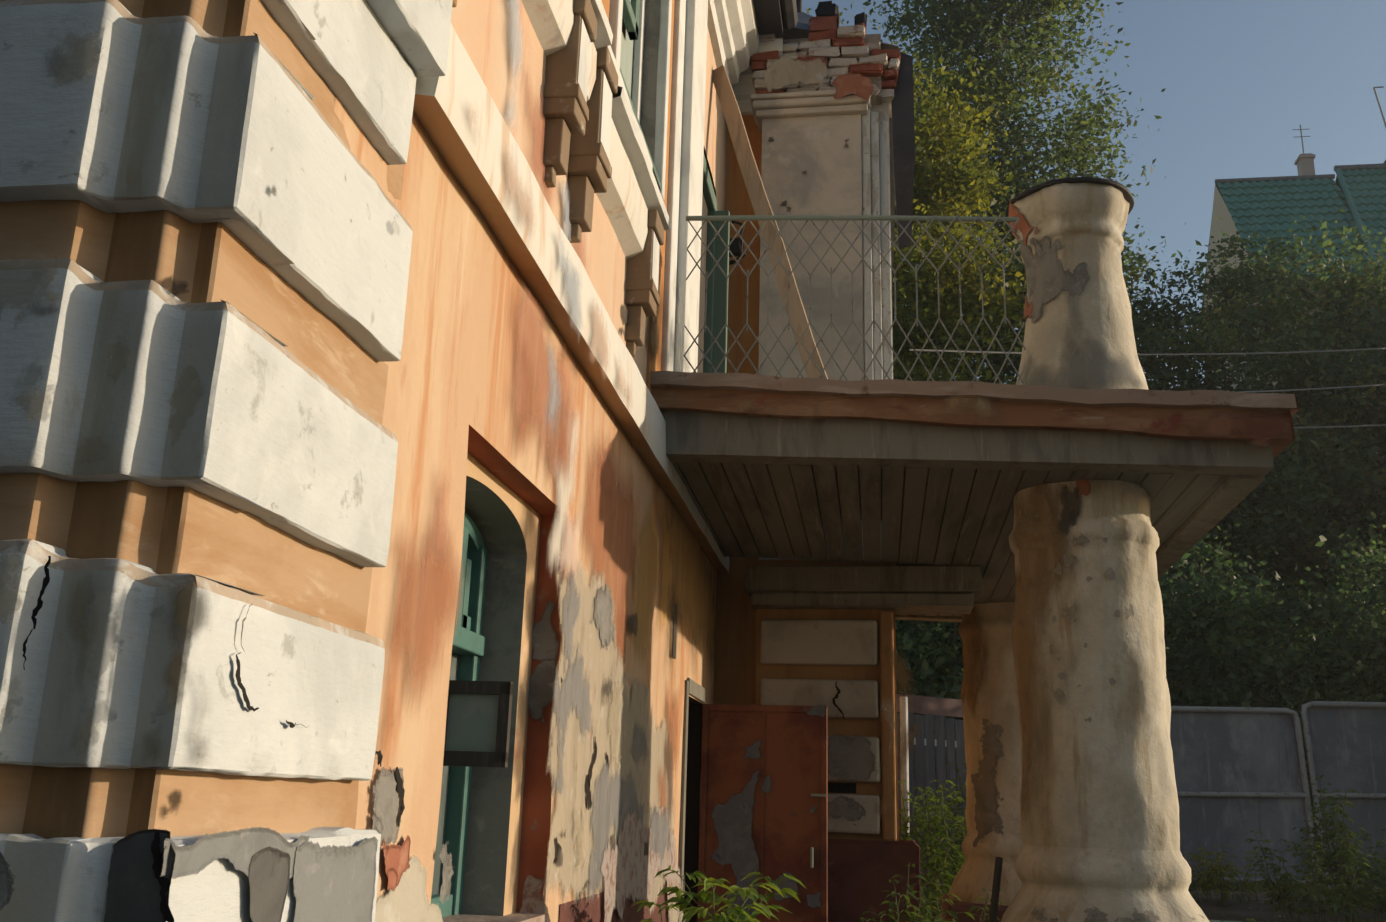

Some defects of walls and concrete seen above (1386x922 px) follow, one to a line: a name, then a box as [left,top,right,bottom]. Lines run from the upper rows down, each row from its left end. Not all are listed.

spalling [749,16,901,118]
spalling [1008,201,1090,327]
crack [22,556,51,670]
spalling [0,852,15,910]
spalling [160,791,181,816]
crack [235,603,307,728]
peeling [249,766,404,922]
spalling [519,560,684,922]
crack [832,681,845,720]
spalling [827,734,875,825]
spalling [1084,907,1159,922]